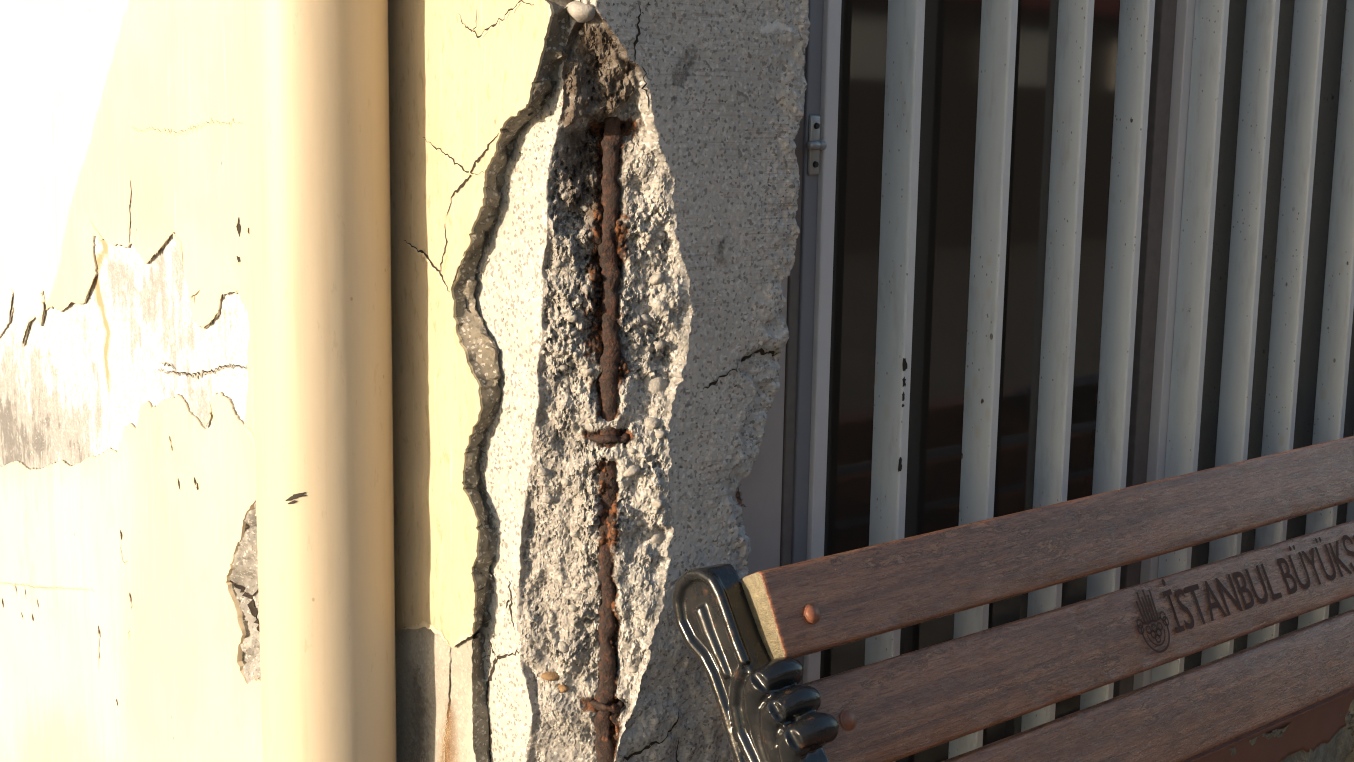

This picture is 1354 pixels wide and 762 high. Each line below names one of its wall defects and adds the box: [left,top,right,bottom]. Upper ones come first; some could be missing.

crack [458,0,534,40]
crack [404,134,498,292]
peeling [0,220,255,469]
spalling [517,1,694,762]
rust [580,118,642,762]
crack [702,345,781,389]
flaking render [727,307,789,538]
flaking render [230,495,261,683]
flaking render [395,621,492,762]